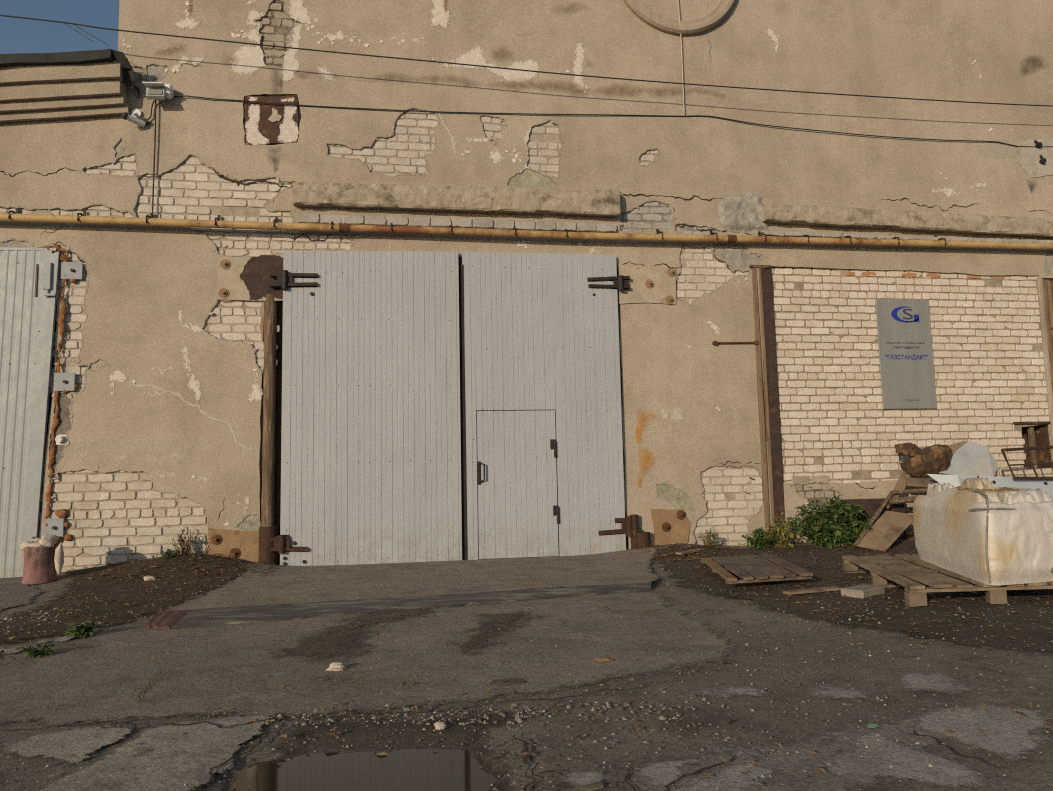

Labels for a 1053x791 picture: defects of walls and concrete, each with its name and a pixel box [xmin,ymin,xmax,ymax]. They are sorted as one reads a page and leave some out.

peeling [229,0,426,81]
peeling [431,0,450,29]
peeling [245,97,299,145]
flaking render [327,107,441,177]
flaking render [461,114,563,188]
flaking render [0,137,354,257]
corrosion [240,255,283,300]
flaking render [619,200,768,306]
flaking render [178,300,280,402]
flaking render [40,246,211,572]
flaking render [224,494,260,531]
flaking render [655,464,764,546]